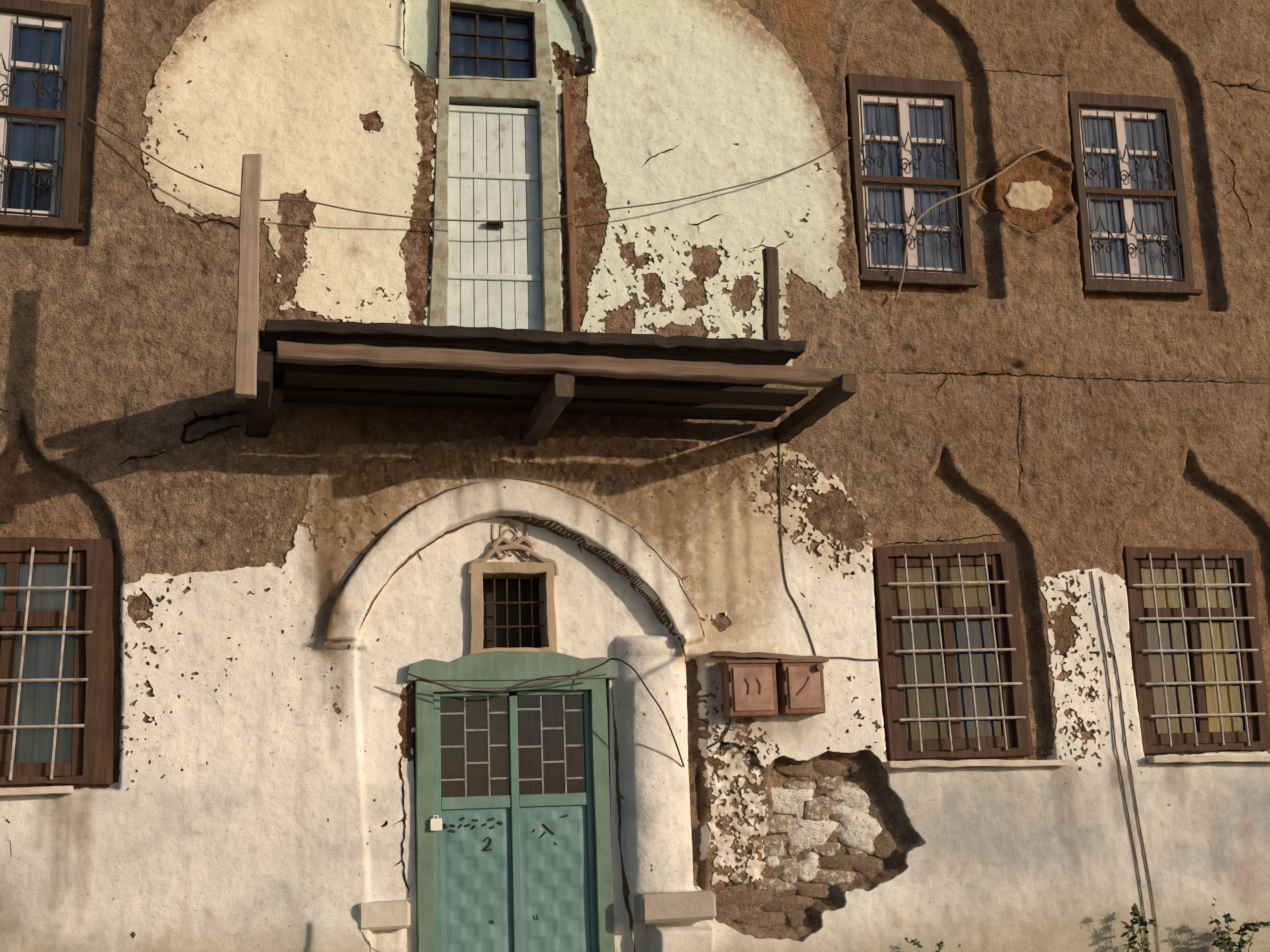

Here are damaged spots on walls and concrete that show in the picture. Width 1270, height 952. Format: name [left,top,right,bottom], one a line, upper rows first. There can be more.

flaking render [361,111,385,133]
flaking render [399,68,438,324]
flaking render [552,0,607,332]
flaking render [276,190,347,322]
flaking render [602,305,637,333]
flaking render [624,242,756,338]
crack [119,409,246,465]
flaking render [761,462,867,554]
flaking render [1050,602,1080,658]
spalling [701,743,901,928]